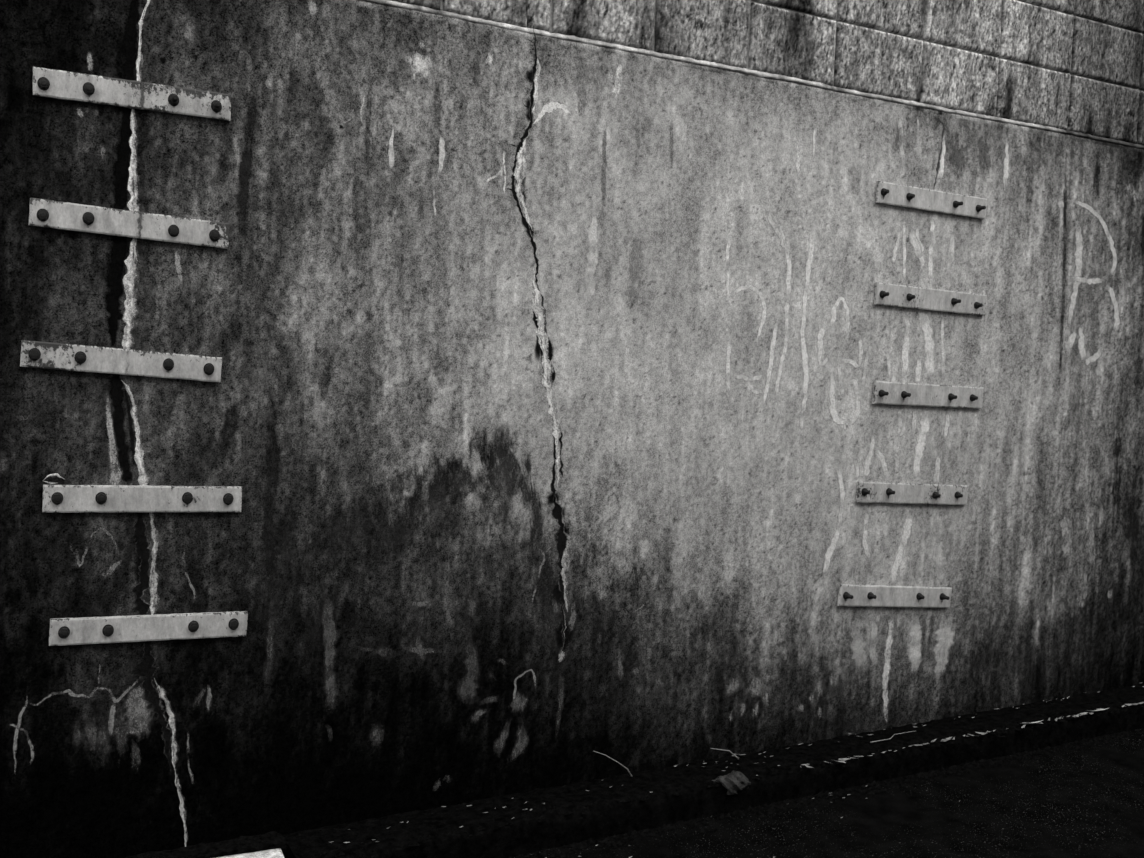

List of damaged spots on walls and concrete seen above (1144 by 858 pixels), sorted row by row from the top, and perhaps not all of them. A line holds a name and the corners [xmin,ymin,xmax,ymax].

crack [122,0,150,81]
crack [10,512,212,847]
crack [104,107,149,485]
water stain [260,401,570,672]
crack [482,7,572,732]